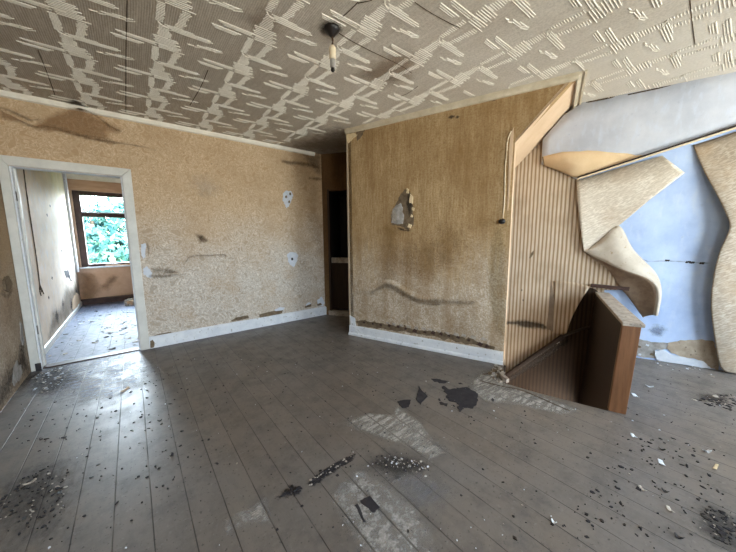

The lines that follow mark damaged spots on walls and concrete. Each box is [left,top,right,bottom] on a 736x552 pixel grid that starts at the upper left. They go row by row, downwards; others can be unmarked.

flaking render [283,191,293,208]
flaking render [391,188,415,230]
leakage [0,321,28,405]
spalling [636,339,711,369]